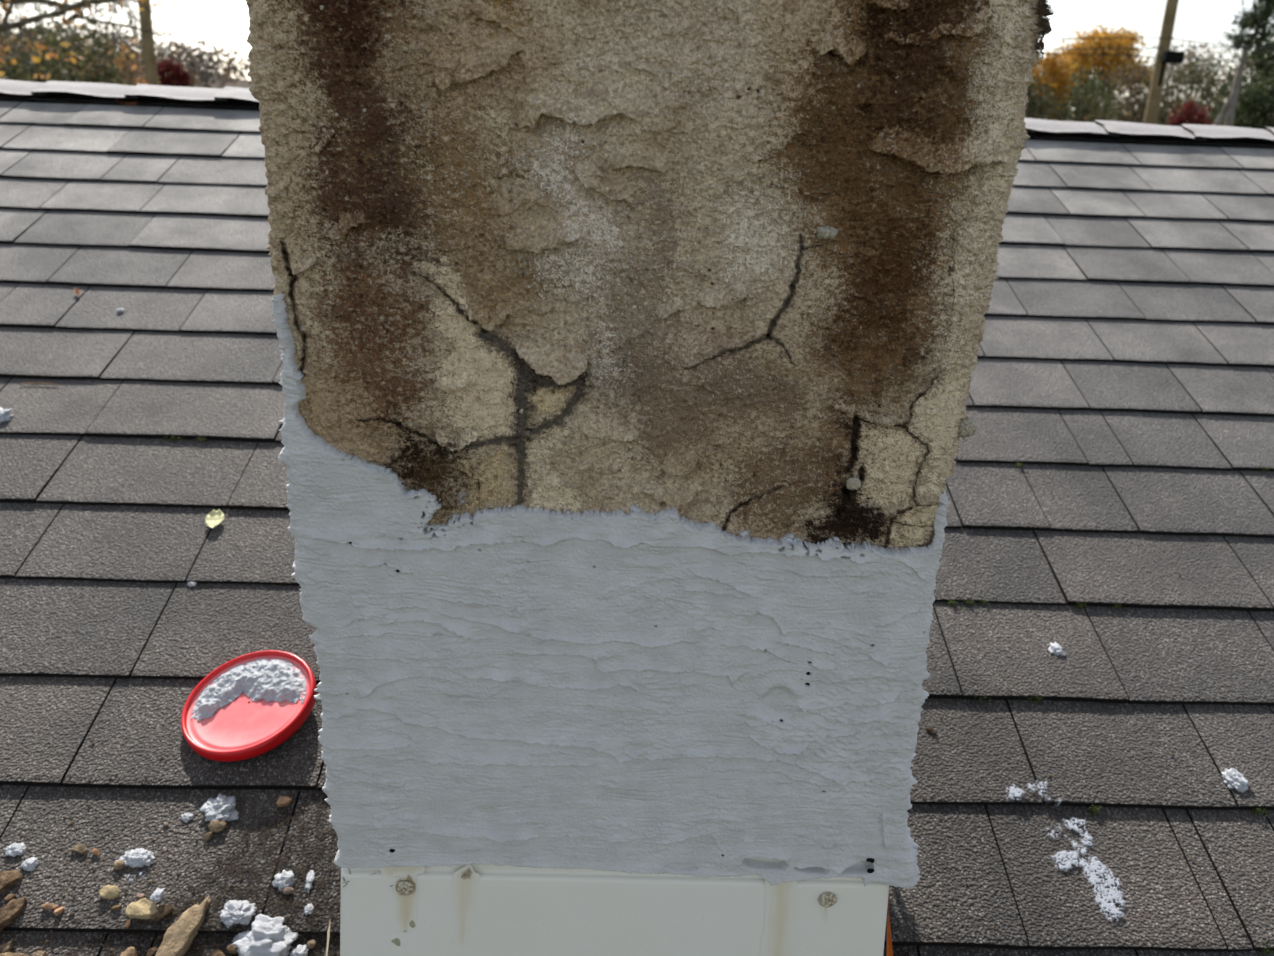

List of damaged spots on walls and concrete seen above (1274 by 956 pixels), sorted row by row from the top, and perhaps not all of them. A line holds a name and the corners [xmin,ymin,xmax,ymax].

peeling [435,0,537,91]
peeling [814,25,869,65]
peeling [880,3,992,46]
peeling [508,66,648,131]
peeling [867,118,1011,175]
crack [280,241,306,371]
leakage [268,0,1054,547]
crack [684,234,823,370]
crack [356,273,587,505]
crack [781,370,944,548]
rust [393,873,419,934]
rust [452,864,480,949]